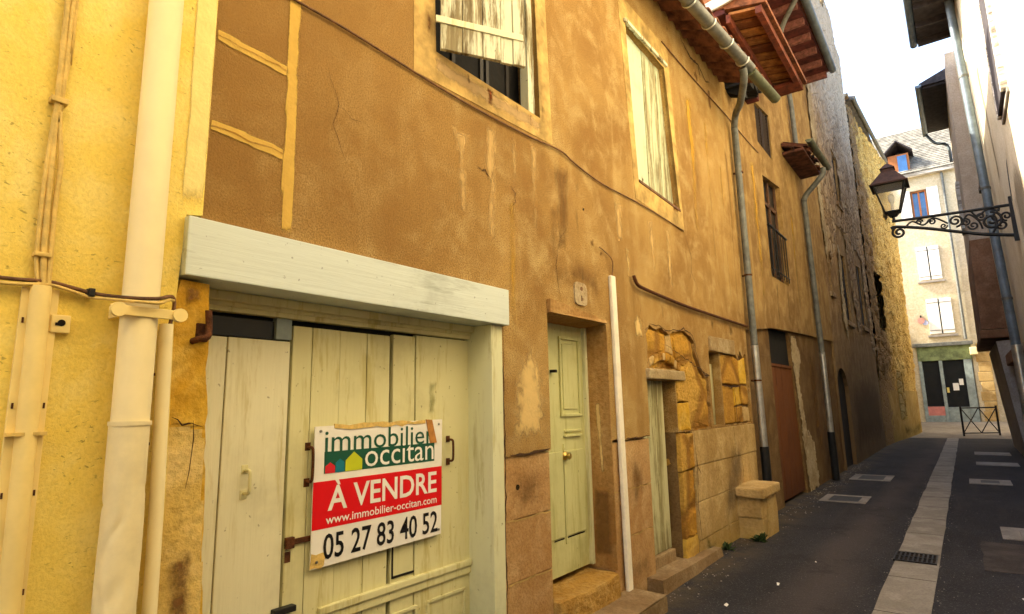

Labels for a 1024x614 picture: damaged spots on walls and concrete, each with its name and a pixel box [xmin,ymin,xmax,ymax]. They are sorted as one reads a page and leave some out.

crack [172,417,202,488]
peeling [516,355,543,435]
spalling [645,324,749,559]
peeling [790,336,820,492]